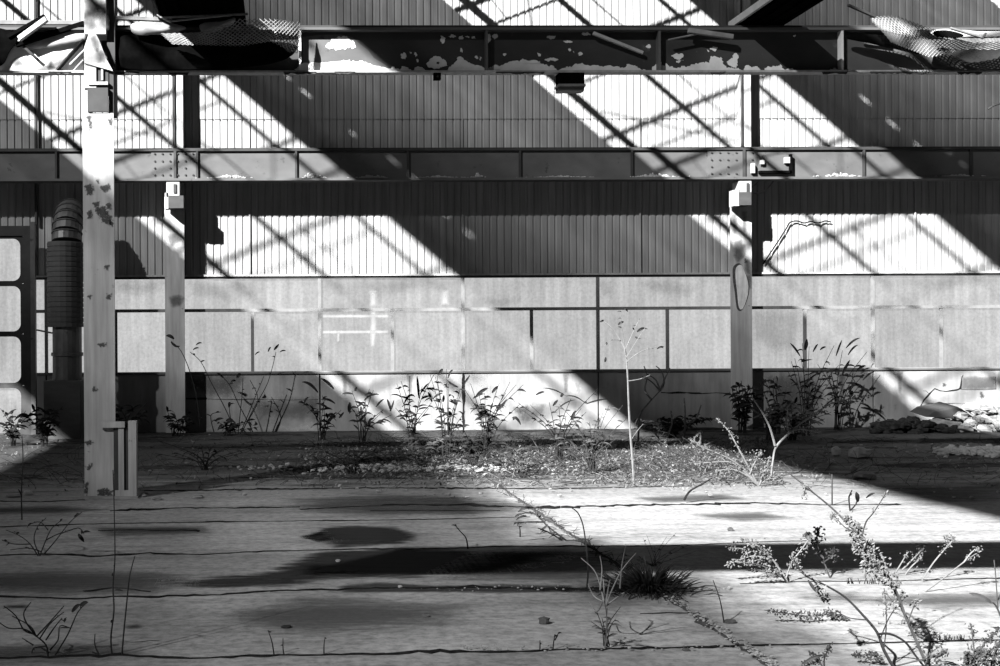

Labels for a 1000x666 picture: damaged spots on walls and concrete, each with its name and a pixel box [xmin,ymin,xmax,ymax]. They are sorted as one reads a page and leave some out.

peeling [295,34,793,70]
damp [0,526,619,630]